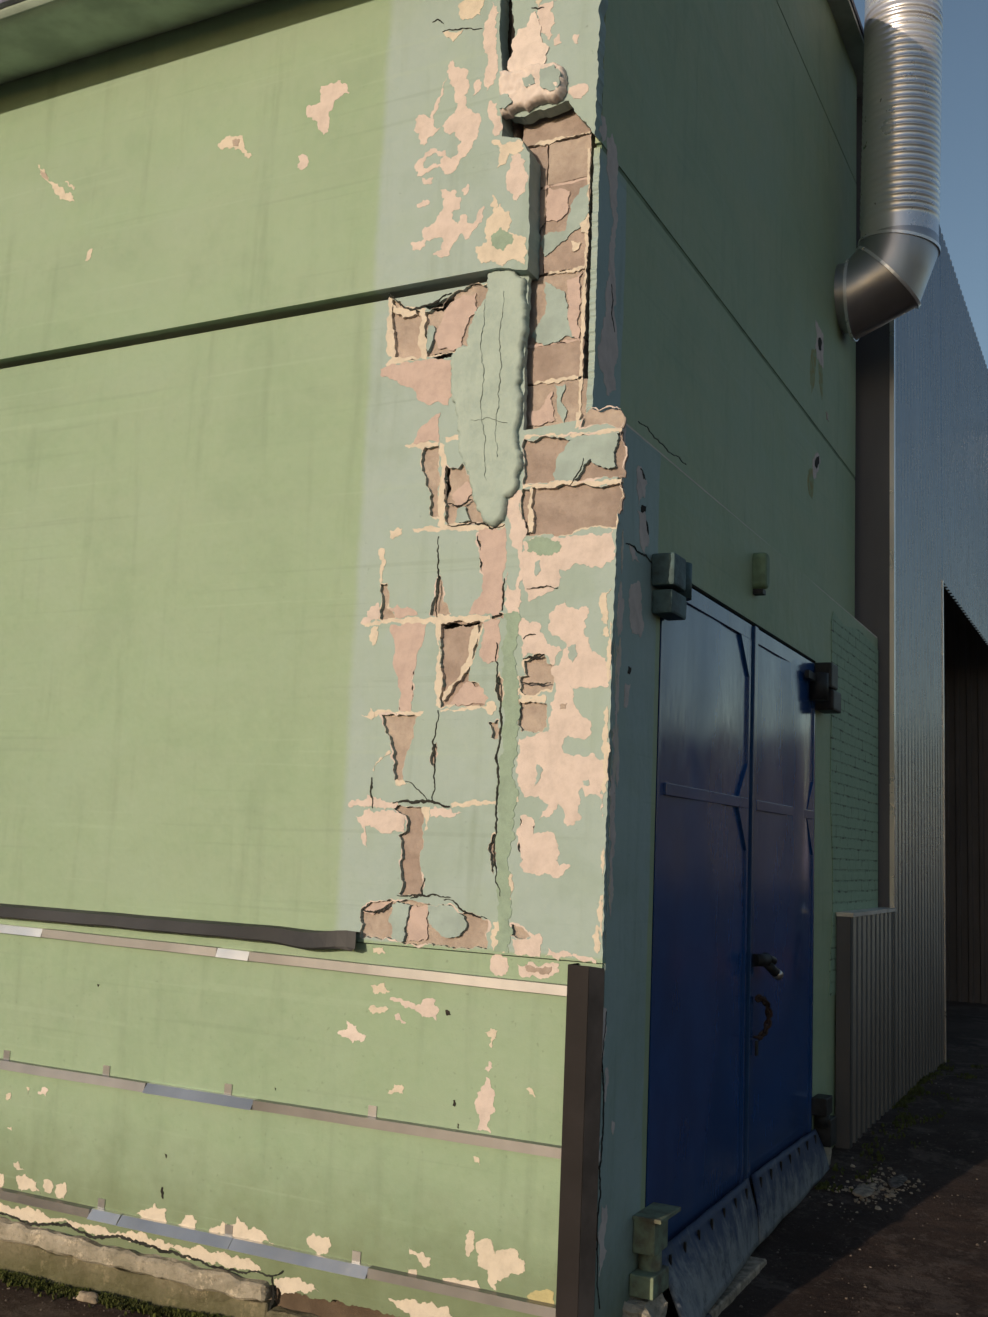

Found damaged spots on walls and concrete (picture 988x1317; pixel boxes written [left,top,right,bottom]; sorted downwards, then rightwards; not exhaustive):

crack [507,0,515,58]
peeling [306,80,349,135]
flaking render [356,0,649,979]
crack [429,536,451,617]
crack [348,578,506,896]
peeling [369,983,439,1024]
peeling [474,1029,498,1134]
peeling [0,1161,273,1273]
peeling [274,1277,319,1295]
peeling [307,1233,331,1255]
peeling [388,1298,452,1317]
peeling [442,1230,525,1290]